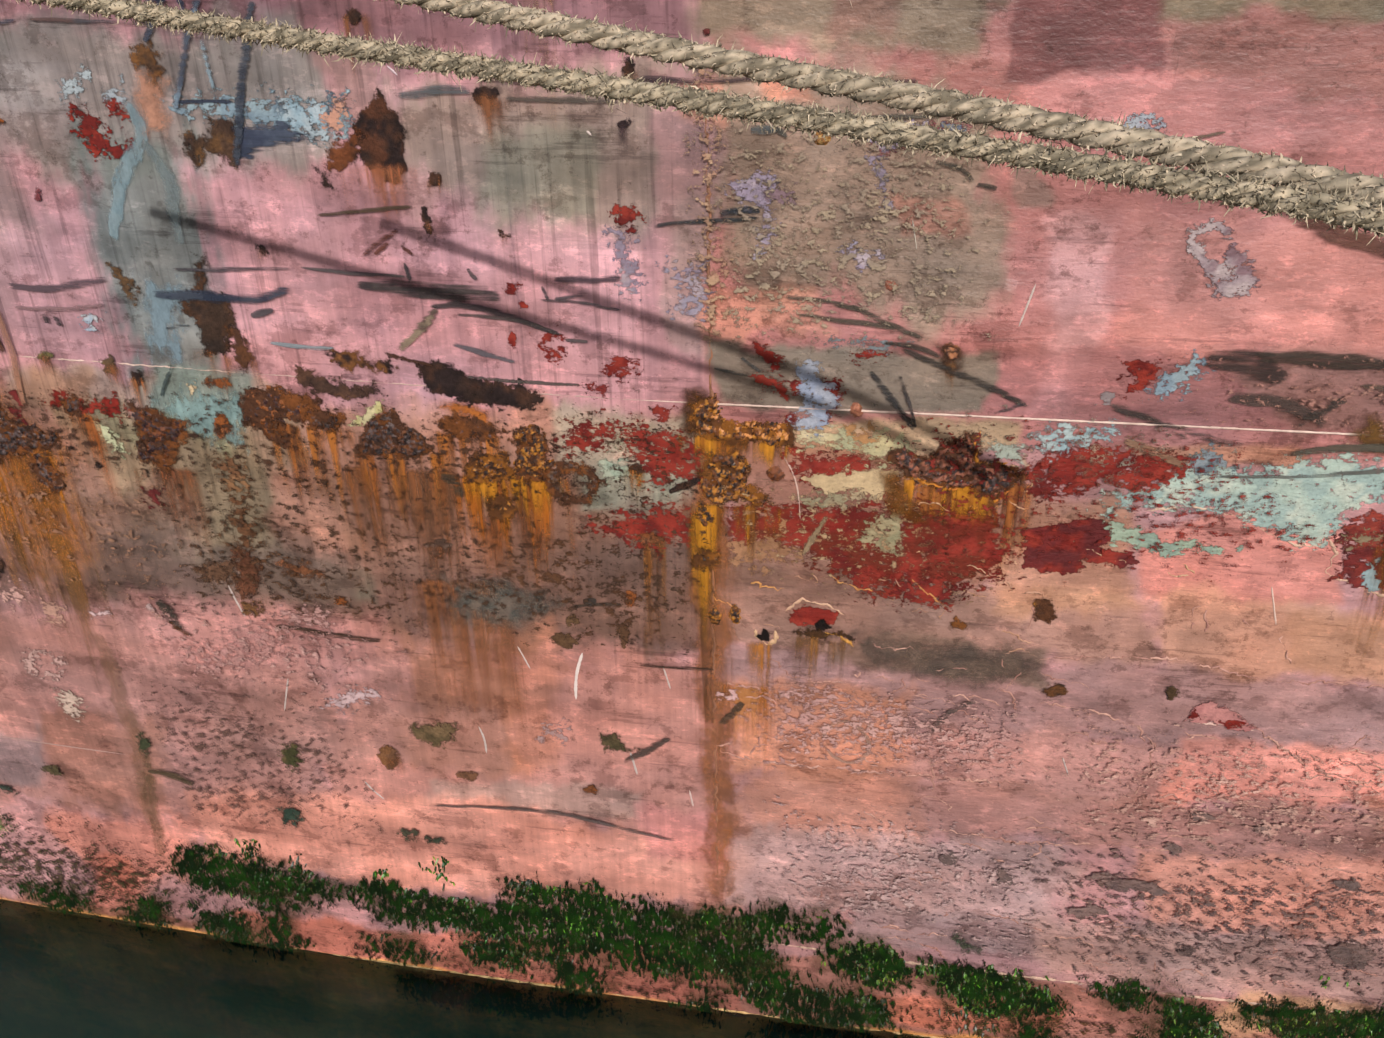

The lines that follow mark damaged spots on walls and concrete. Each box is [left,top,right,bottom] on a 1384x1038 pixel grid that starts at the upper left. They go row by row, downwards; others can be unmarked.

peeling [54,65,183,243]
peeling [159,81,356,165]
rust [314,88,408,198]
peeling [1112,112,1168,132]
rust [0,315,88,615]
rust [98,255,606,666]
peeling [0,119,1384,947]
rust [885,424,1030,547]
rust [669,390,796,893]
spalling [323,915,748,1017]